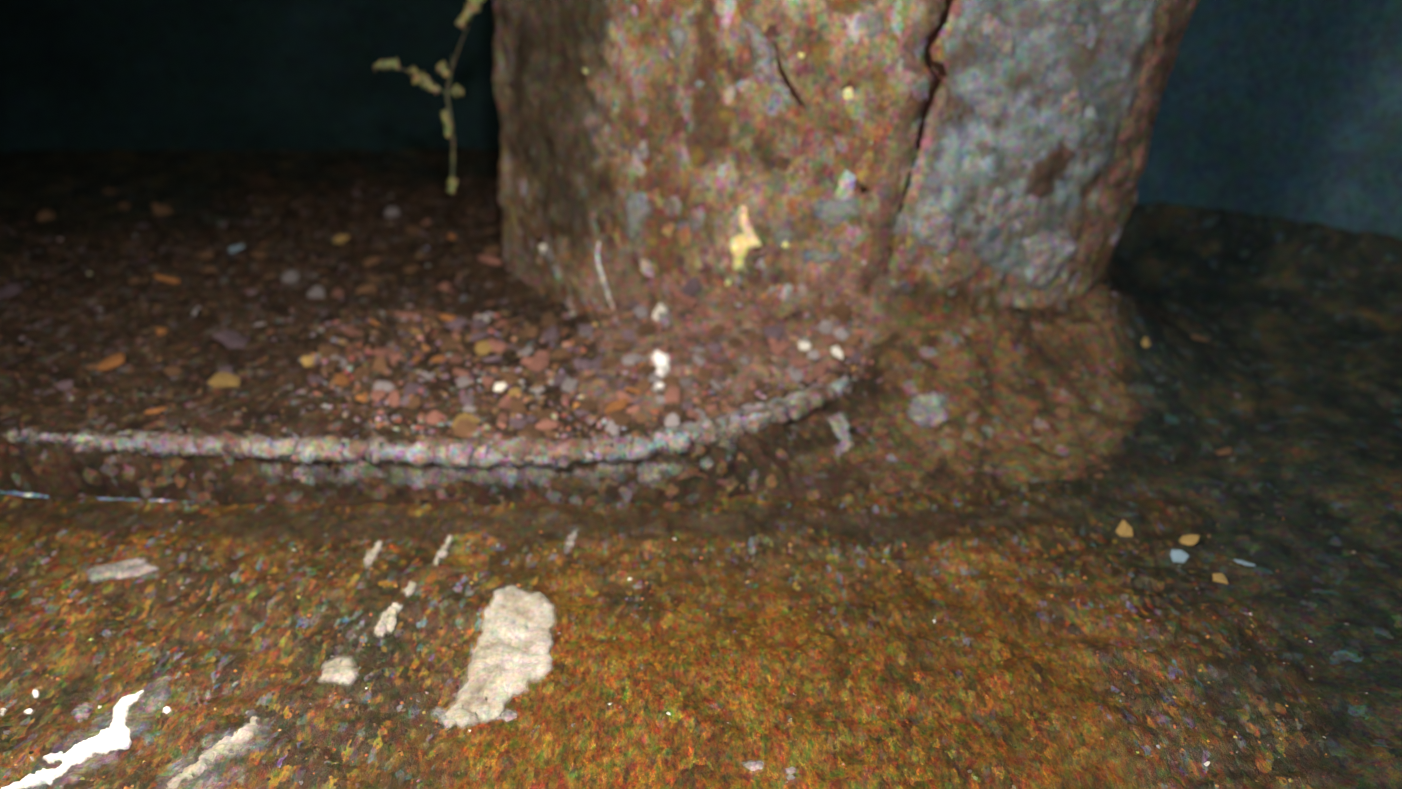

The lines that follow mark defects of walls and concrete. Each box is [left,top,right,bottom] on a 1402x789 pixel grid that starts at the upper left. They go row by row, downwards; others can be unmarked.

crack [884,0,953,274]